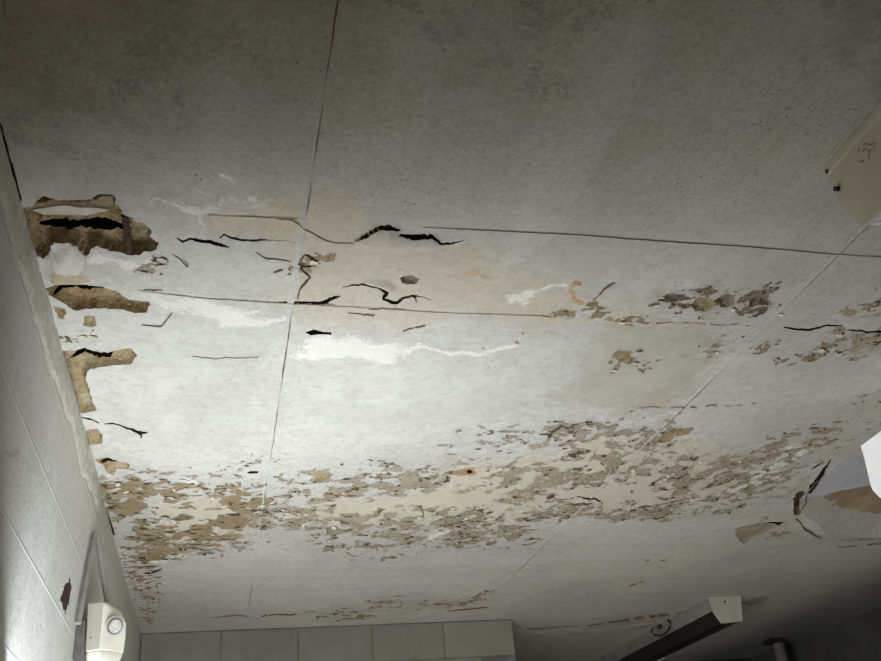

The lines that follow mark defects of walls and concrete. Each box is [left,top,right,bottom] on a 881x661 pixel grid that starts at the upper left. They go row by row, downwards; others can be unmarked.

spalling [23,194,169,276]
crack [137,215,875,332]
spalling [46,285,150,414]
peeling [608,349,661,374]
spalling [549,279,789,358]
peeling [748,285,881,366]
crack [784,324,881,334]
spalling [86,428,103,446]
crack [82,417,148,446]
peeling [95,411,881,625]